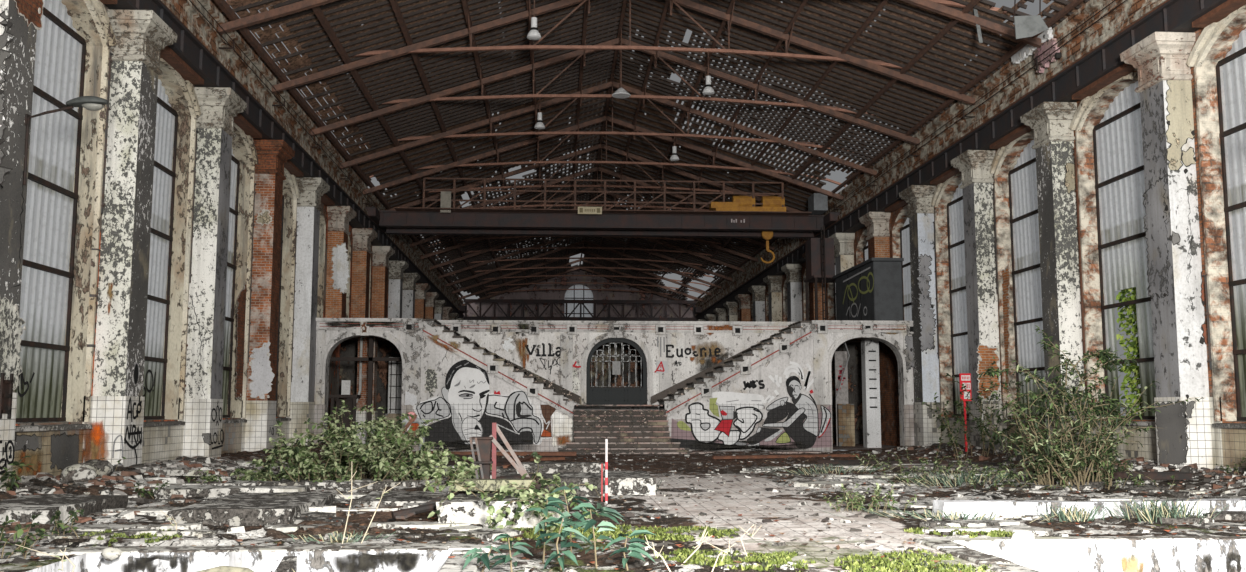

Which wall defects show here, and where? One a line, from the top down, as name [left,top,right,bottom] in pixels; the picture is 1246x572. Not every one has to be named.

peeling [0,0,44,188]
peeling [1143,80,1196,299]
peeling [0,297,26,390]
spalling [235,281,275,400]
rust [82,424,107,463]
spalling [956,540,1246,572]